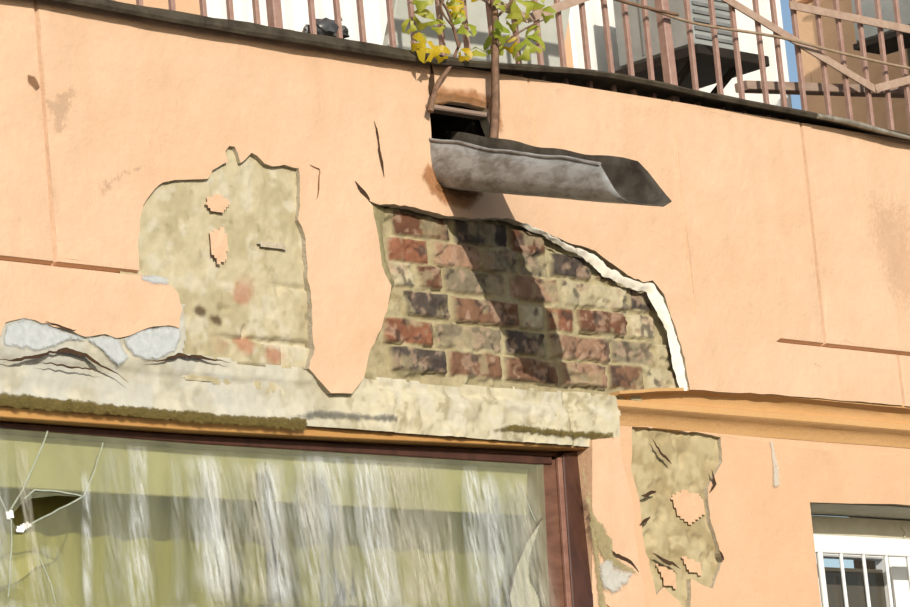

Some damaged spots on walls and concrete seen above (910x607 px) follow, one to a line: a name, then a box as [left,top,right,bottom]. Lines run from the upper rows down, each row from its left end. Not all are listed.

crack [355,181,370,200]
crack [374,121,384,174]
flaking render [364,204,688,403]
flaking render [586,493,639,607]
flaking render [631,428,724,607]